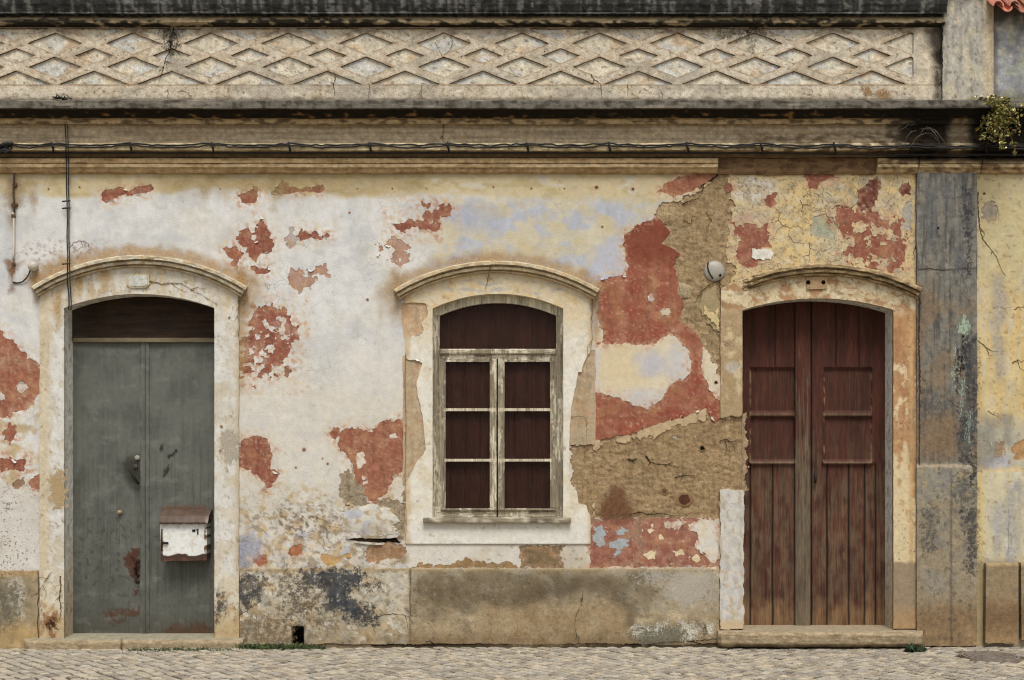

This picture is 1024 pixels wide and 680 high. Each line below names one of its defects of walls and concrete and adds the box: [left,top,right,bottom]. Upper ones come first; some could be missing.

peeling [223,217,330,274]
crack [771,192,859,261]
peeling [809,176,913,273]
crack [913,192,1003,282]
leakage [960,186,975,280]
peeling [0,330,40,490]
peeling [239,303,300,389]
peeling [320,355,426,567]
crack [628,455,700,479]
spalling [569,174,772,568]
leakage [911,334,1010,576]
leakage [210,537,387,645]